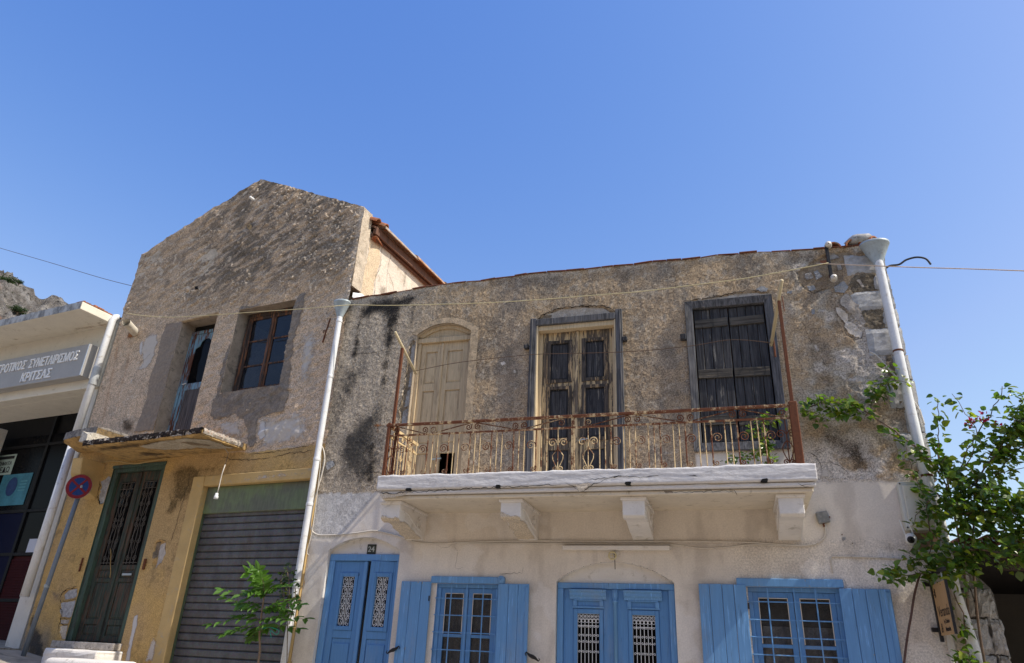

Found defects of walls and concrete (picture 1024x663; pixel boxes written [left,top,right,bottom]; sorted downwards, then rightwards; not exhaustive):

spalling [797,251,877,293]
peeling [131,335,158,382]
damp [352,289,415,385]
spalling [836,307,885,358]
spalling [886,355,895,377]
peeling [258,413,306,445]
damp [340,403,382,481]
damp [167,467,216,513]
spalling [59,586,77,639]